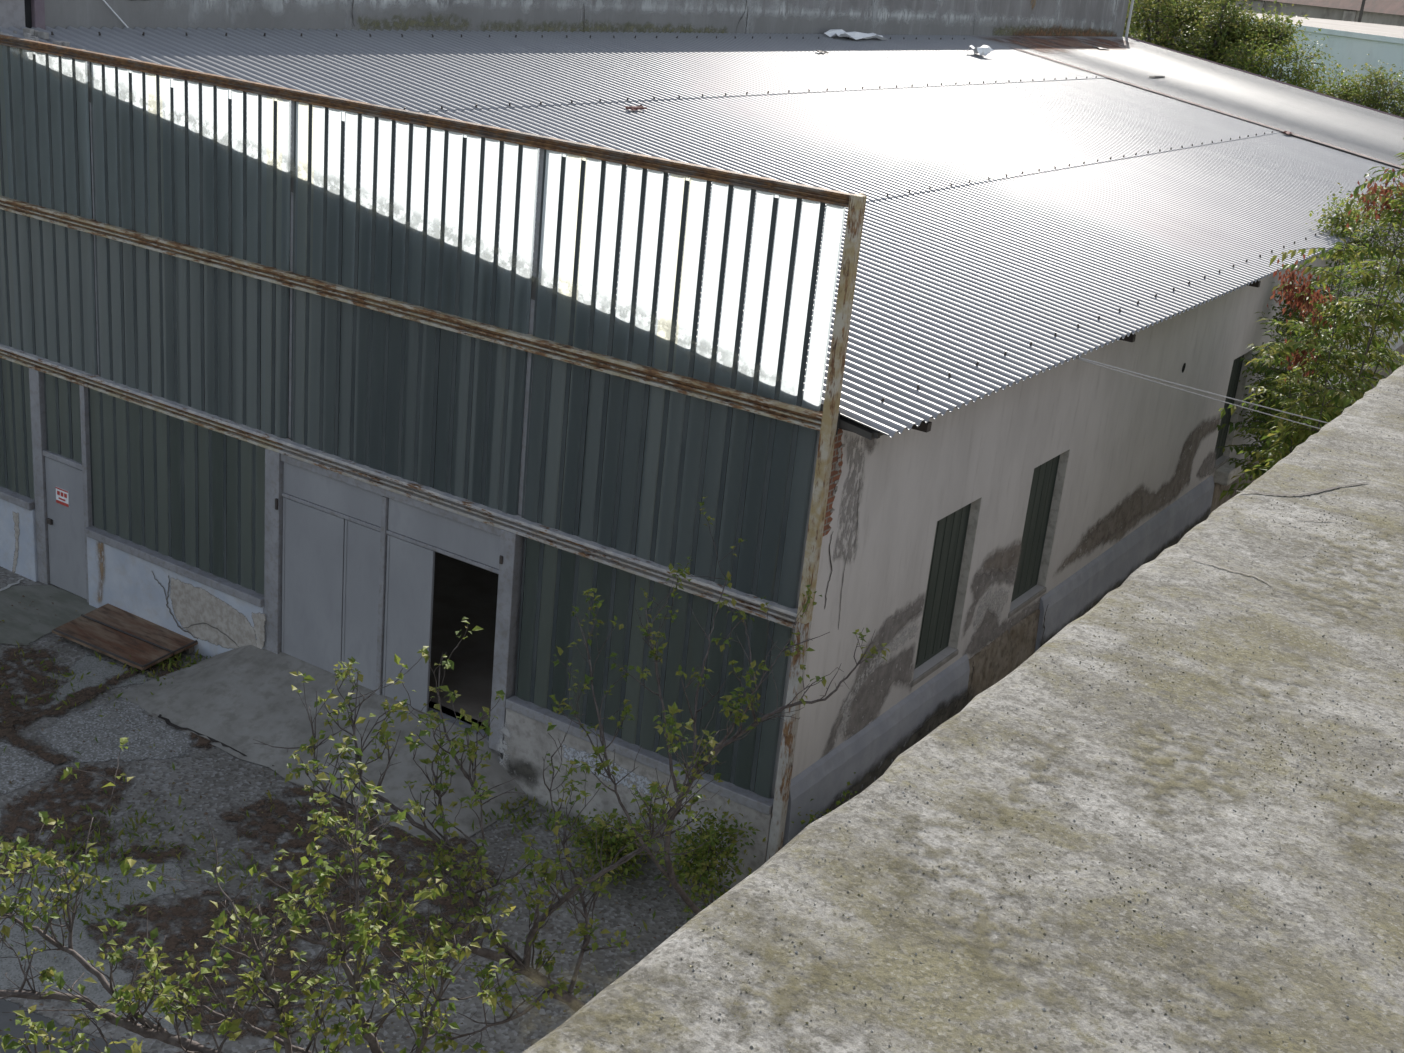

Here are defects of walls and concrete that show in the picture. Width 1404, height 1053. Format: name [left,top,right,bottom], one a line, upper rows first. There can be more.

rust [993,27,1404,168]
peeling [823,429,864,560]
water stain [1059,418,1220,569]
crack [152,572,239,647]
water stain [824,596,924,755]
water stain [964,543,1041,654]
spalling [967,609,1040,697]